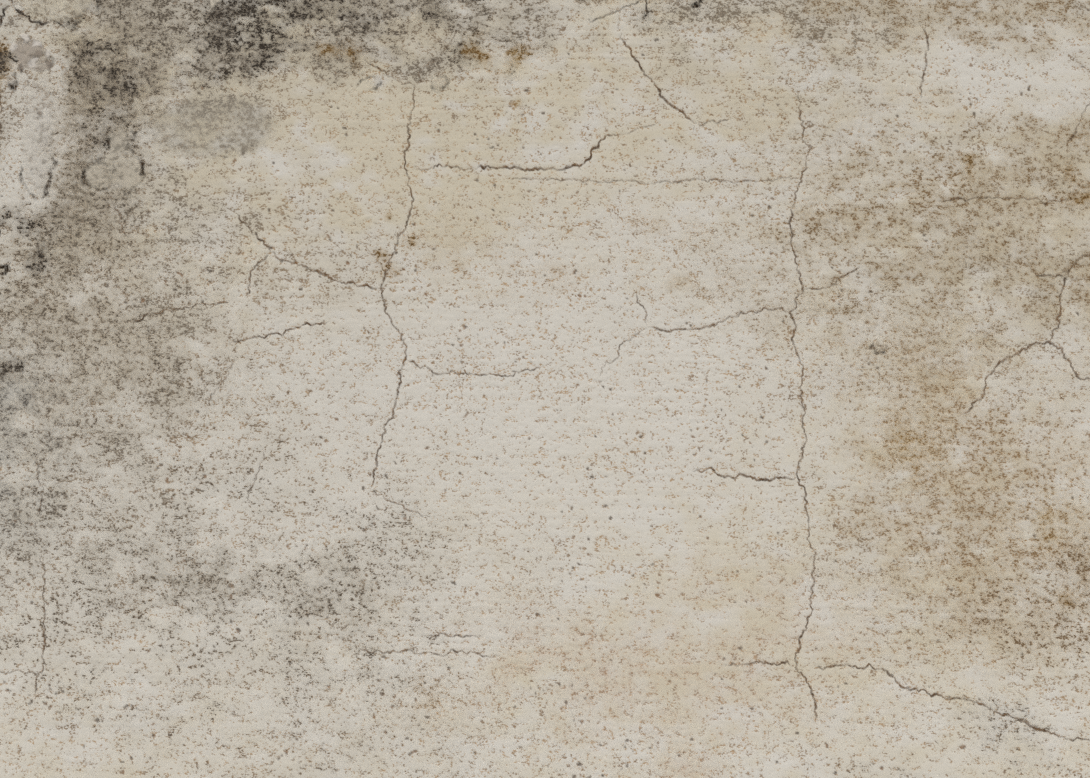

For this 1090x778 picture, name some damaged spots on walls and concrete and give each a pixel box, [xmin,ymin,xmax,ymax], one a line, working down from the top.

damp [188,0,378,83]
crack [624,41,726,124]
damp [52,41,138,216]
crack [434,134,615,182]
damp [1,210,52,276]
crack [136,301,224,321]
crack [237,64,539,510]
crack [636,110,1090,741]
damp [845,345,1090,667]